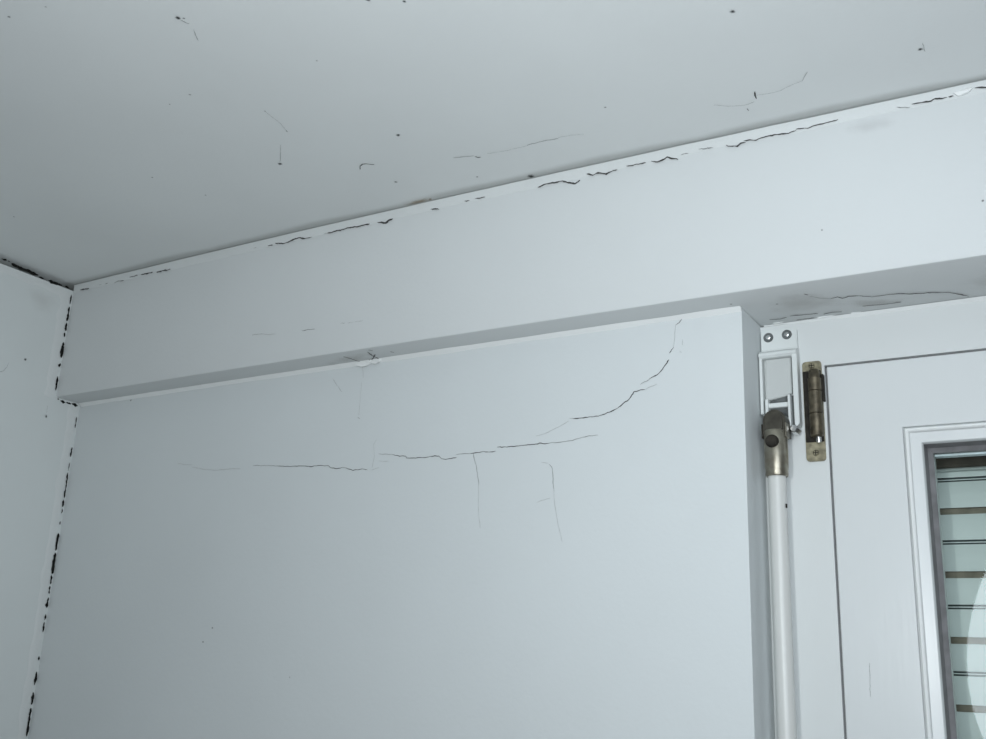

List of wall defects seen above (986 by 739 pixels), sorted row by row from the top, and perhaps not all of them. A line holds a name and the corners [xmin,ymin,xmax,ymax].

crack [898,86,986,108]
crack [539,119,838,187]
crack [255,219,392,248]
crack [2,259,170,631]
crack [178,319,683,539]
crack [26,657,40,736]